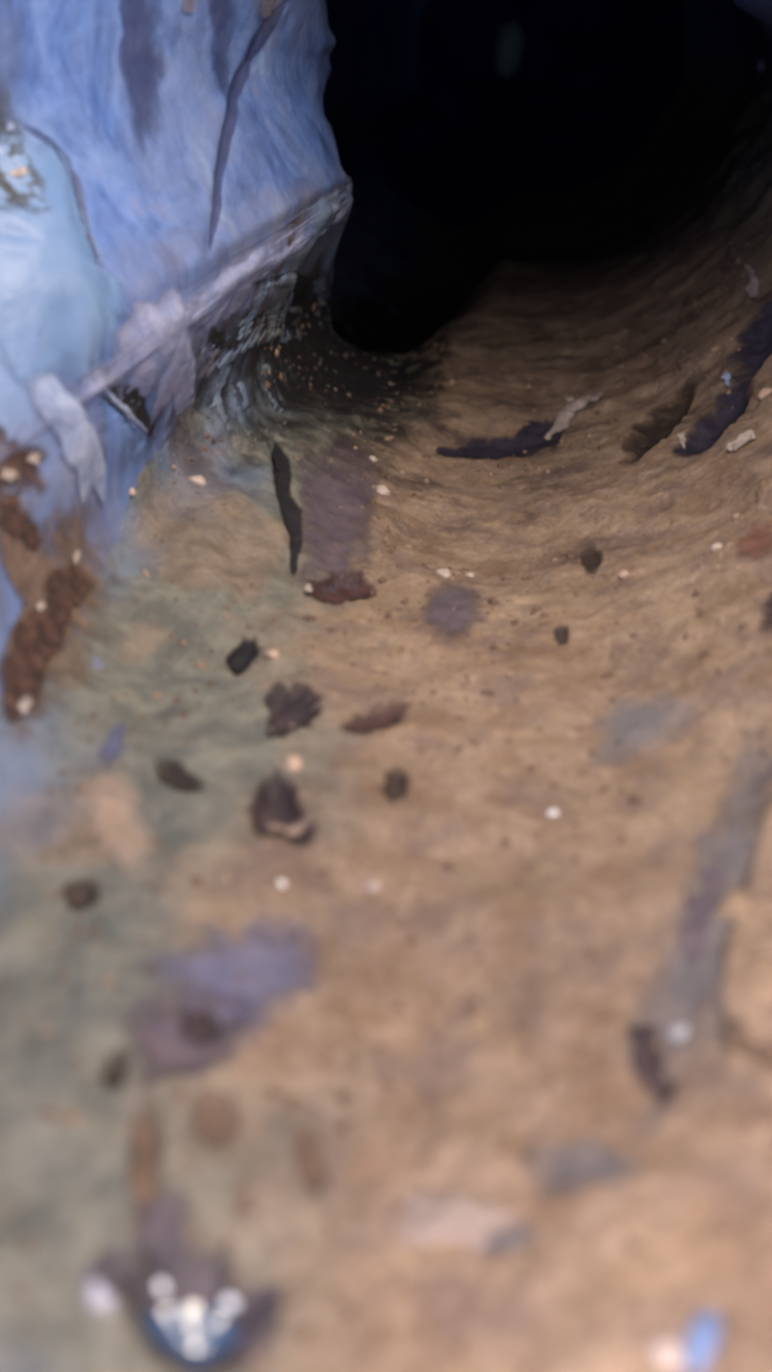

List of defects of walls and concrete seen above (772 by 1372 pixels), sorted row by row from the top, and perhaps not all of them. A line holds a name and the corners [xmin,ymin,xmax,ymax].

rust [0,426,103,728]